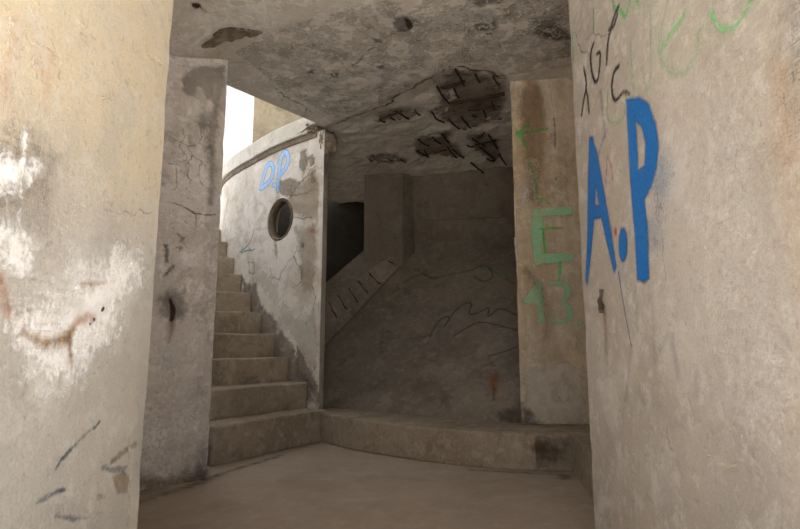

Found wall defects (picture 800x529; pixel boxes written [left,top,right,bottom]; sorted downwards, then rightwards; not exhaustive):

spalling [201,27,263,49]
spalling [336,95,421,124]
spalling [411,66,507,165]
spalling [416,133,484,173]
rust [37,327,74,357]
water stain [4,242,148,399]
water stain [242,276,319,403]